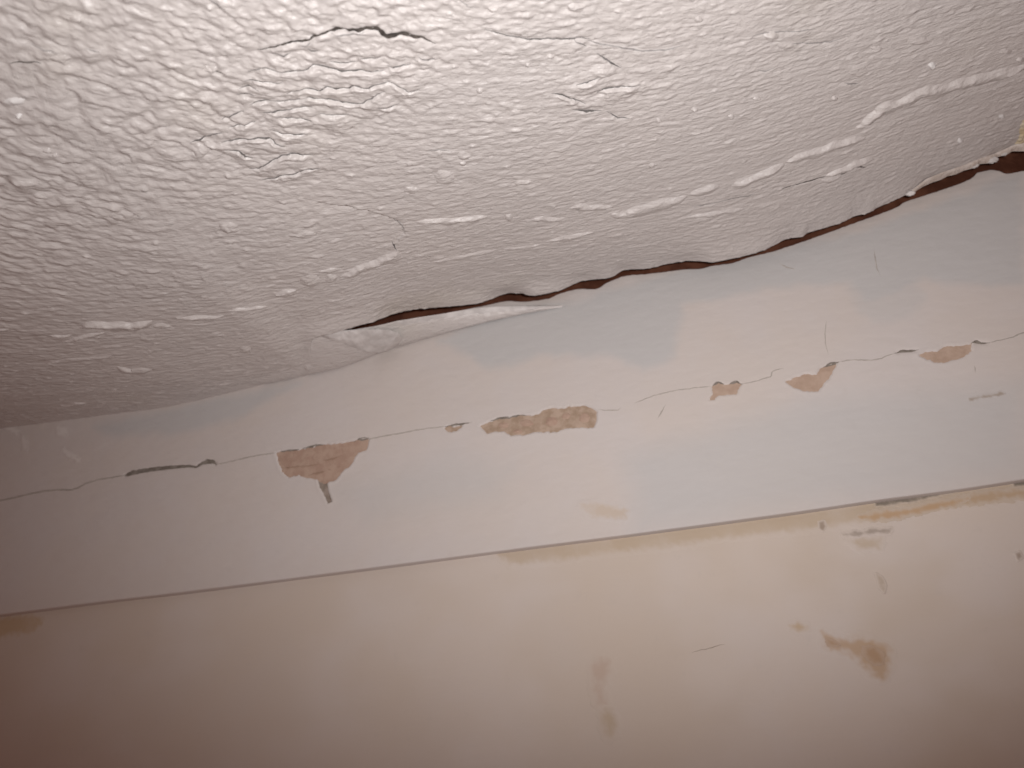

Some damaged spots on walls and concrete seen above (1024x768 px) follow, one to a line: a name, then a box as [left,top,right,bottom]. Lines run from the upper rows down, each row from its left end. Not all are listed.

crack [257,26,433,50]
flaking render [920,343,972,363]
crack [972,332,1024,370]
flaking render [636,353,895,403]
crack [0,453,273,501]
flaking render [277,406,619,503]